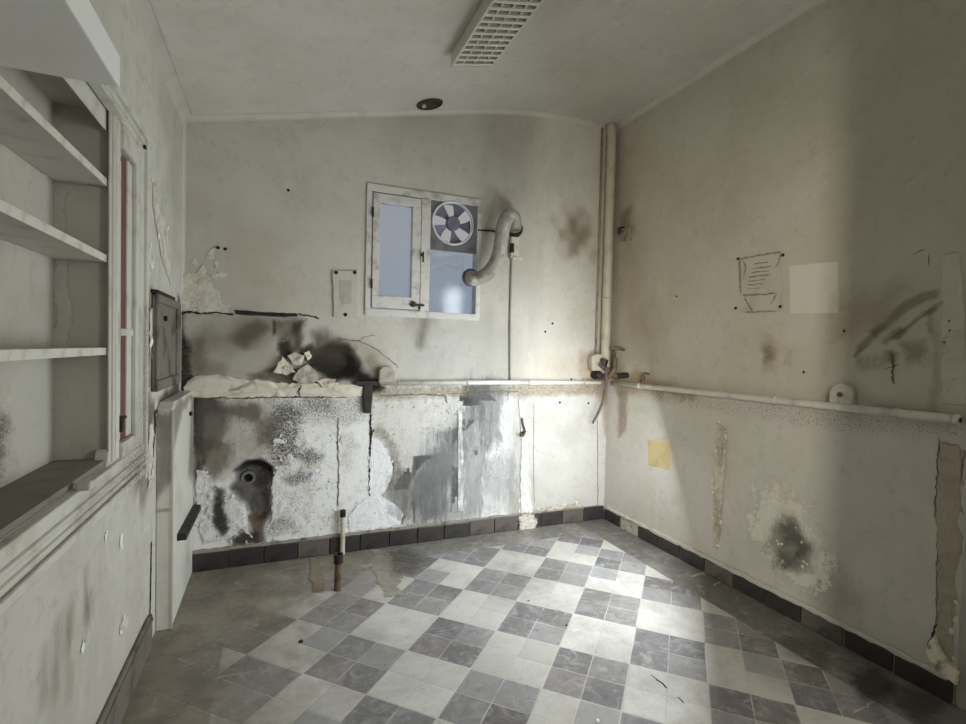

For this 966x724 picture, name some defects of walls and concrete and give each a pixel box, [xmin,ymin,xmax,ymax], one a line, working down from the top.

peeling [149,178,230,315]
leakage [161,330,193,401]
leakage [193,398,327,546]
peeling [926,442,963,685]